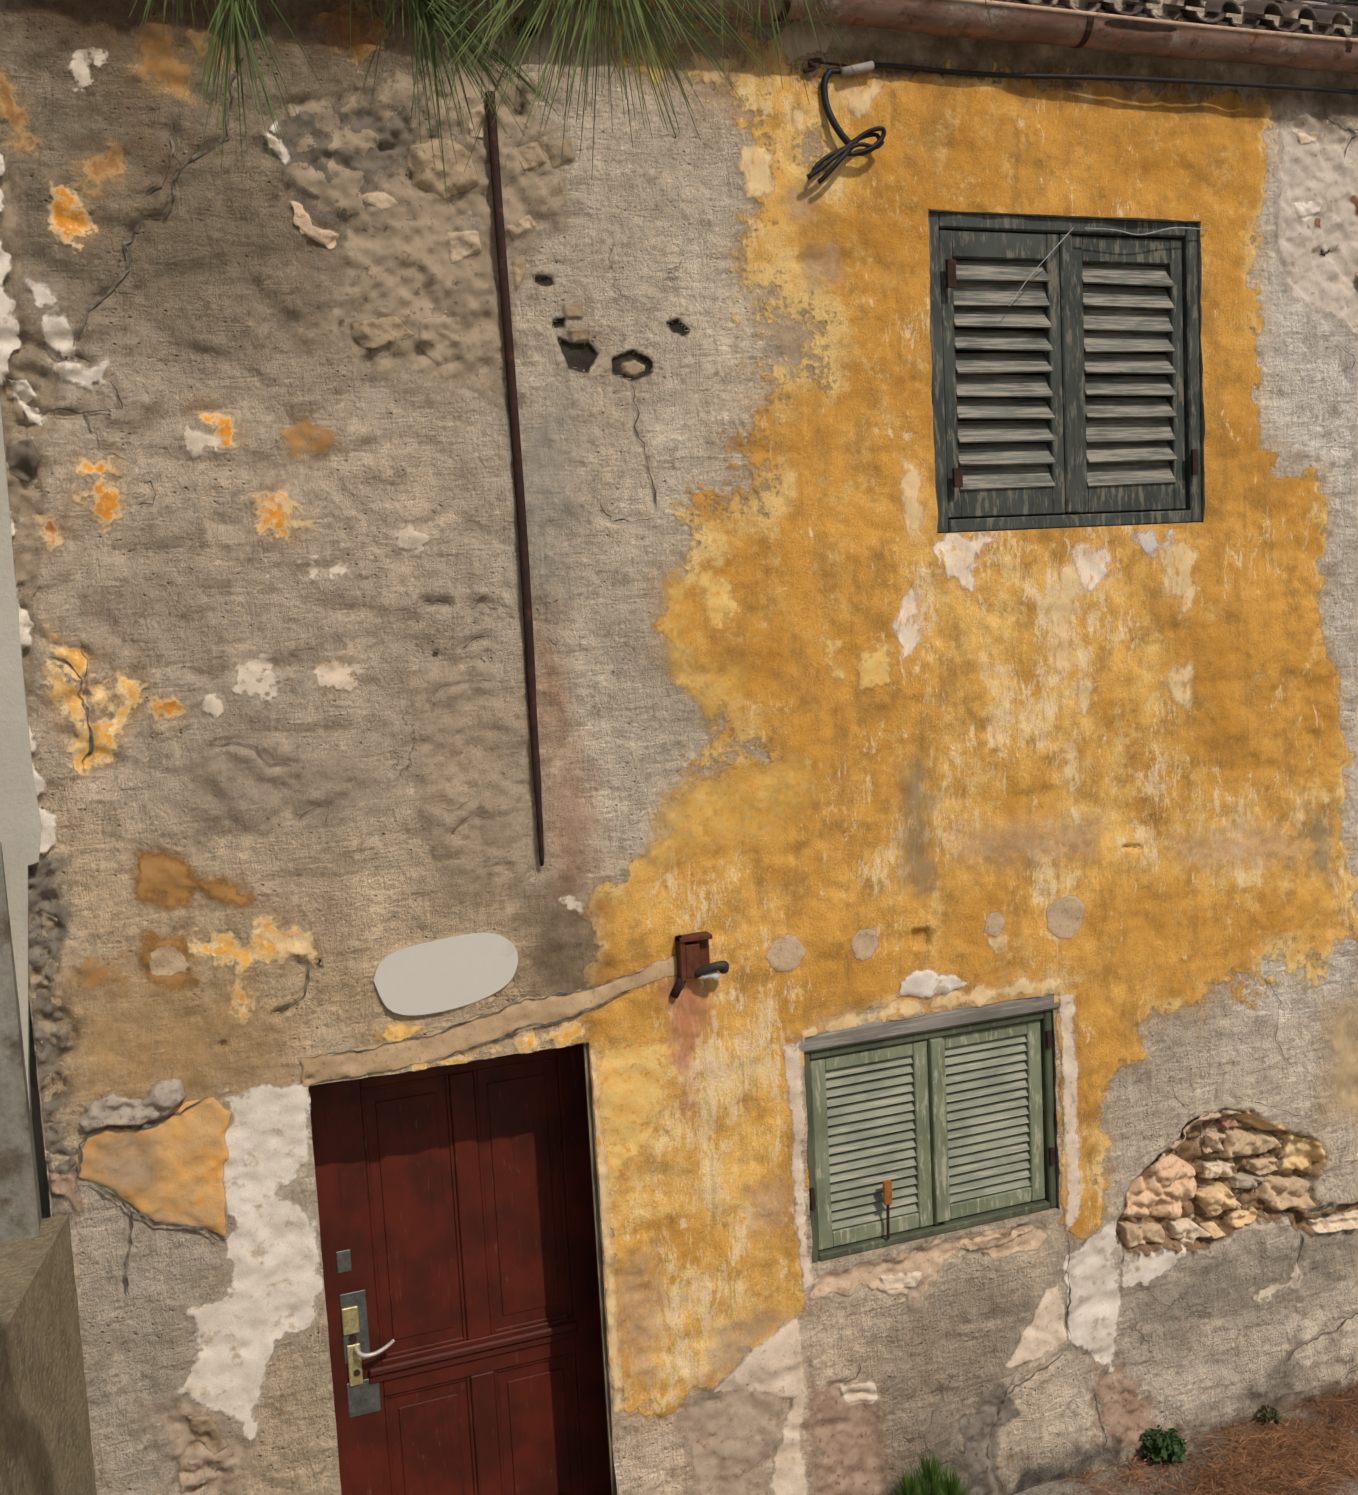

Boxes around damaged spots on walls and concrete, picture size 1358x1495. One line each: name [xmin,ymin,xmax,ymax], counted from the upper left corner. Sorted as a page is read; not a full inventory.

spalling [0,73,282,774]
crack [36,17,270,506]
peeling [296,543,351,580]
spalling [265,5,575,406]
peeling [411,7,1358,1495]
peeling [28,851,323,1495]
crack [305,965,652,1064]
crack [1258,1203,1354,1269]
crack [1272,1313,1358,1377]